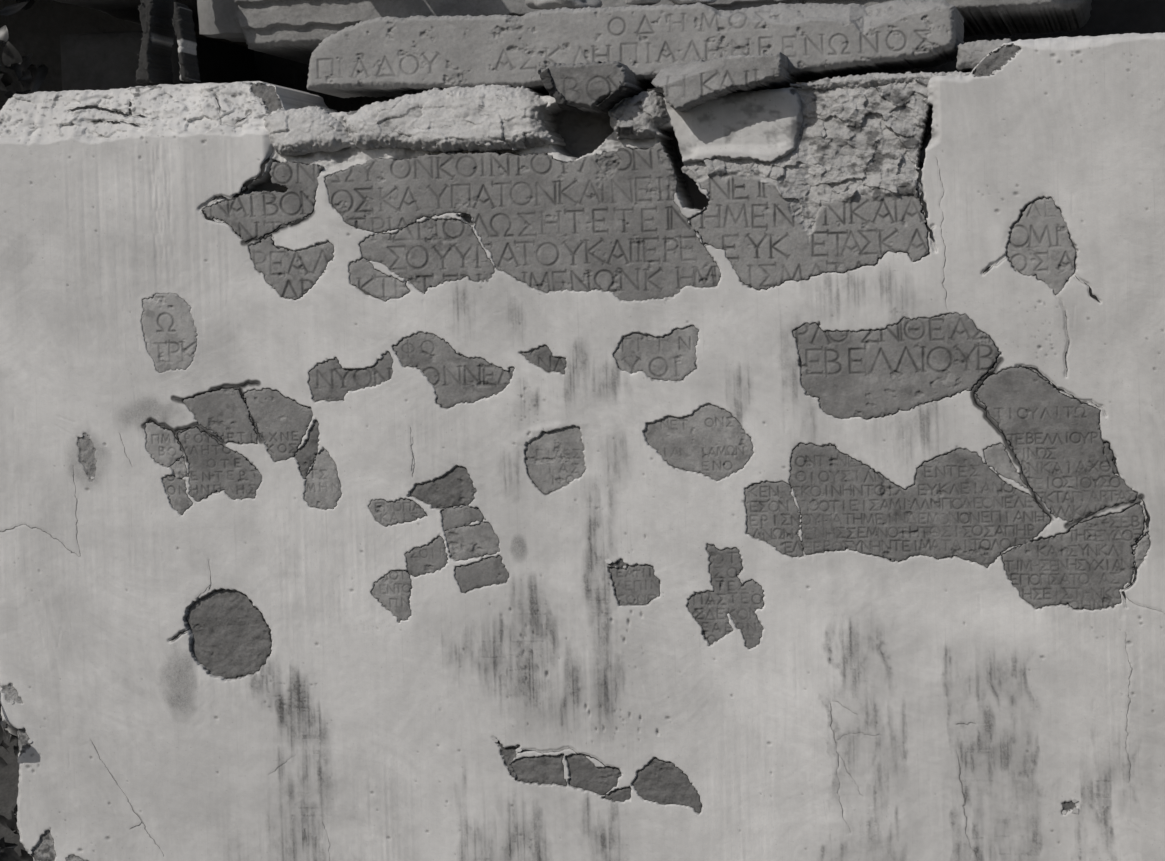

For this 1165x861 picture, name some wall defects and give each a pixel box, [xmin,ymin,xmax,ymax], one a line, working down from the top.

spalling [492,737,522,781]